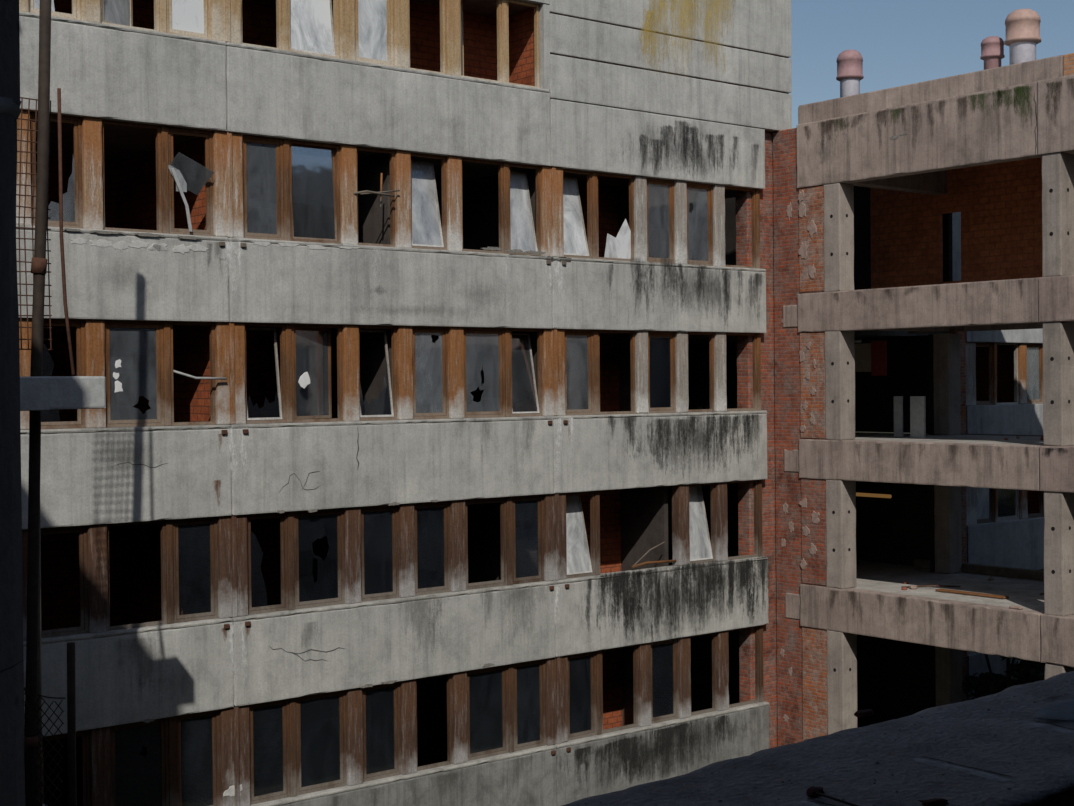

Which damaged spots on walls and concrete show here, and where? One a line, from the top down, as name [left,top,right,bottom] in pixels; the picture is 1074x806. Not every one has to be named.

leakage [640,121,737,168]
leakage [805,114,862,138]
leakage [877,101,945,127]
leakage [997,86,1031,114]
leakage [635,258,729,302]
leakage [657,415,759,457]
leakage [587,556,771,624]
crack [269,646,345,661]